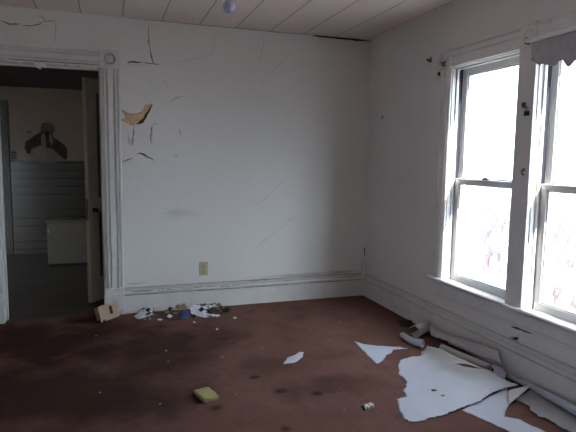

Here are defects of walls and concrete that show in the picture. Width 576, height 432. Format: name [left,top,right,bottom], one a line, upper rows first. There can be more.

crack [2,15,56,40]
crack [127,25,202,66]
peeling [121,103,153,146]
crack [123,123,157,162]